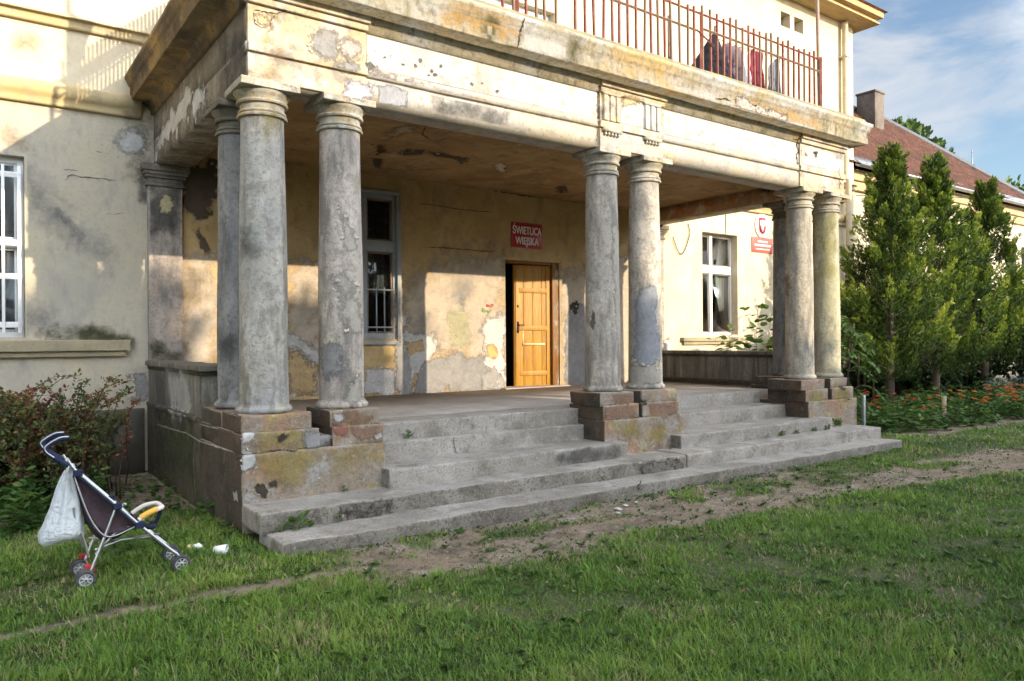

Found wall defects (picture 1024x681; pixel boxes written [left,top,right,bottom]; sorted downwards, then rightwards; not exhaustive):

peeling [112,83,206,161]
peeling [307,28,442,103]
peeling [287,256,363,400]
peeling [330,245,506,439]
peeling [554,266,595,385]
peeling [605,224,680,420]
flaking render [240,431,258,472]